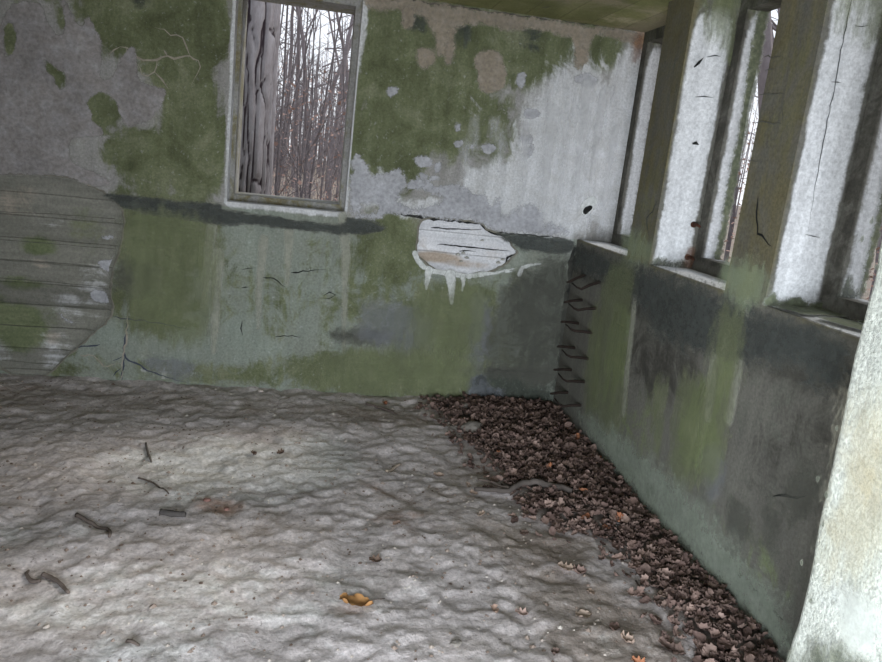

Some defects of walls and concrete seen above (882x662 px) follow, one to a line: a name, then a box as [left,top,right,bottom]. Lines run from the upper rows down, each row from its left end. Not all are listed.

spalling [0,0,166,376]
crack [78,316,189,382]
crack [242,268,326,288]
peeling [349,153,569,275]
peeling [454,124,496,154]
damp [412,233,851,423]
crack [756,199,771,246]
crack [806,0,868,238]